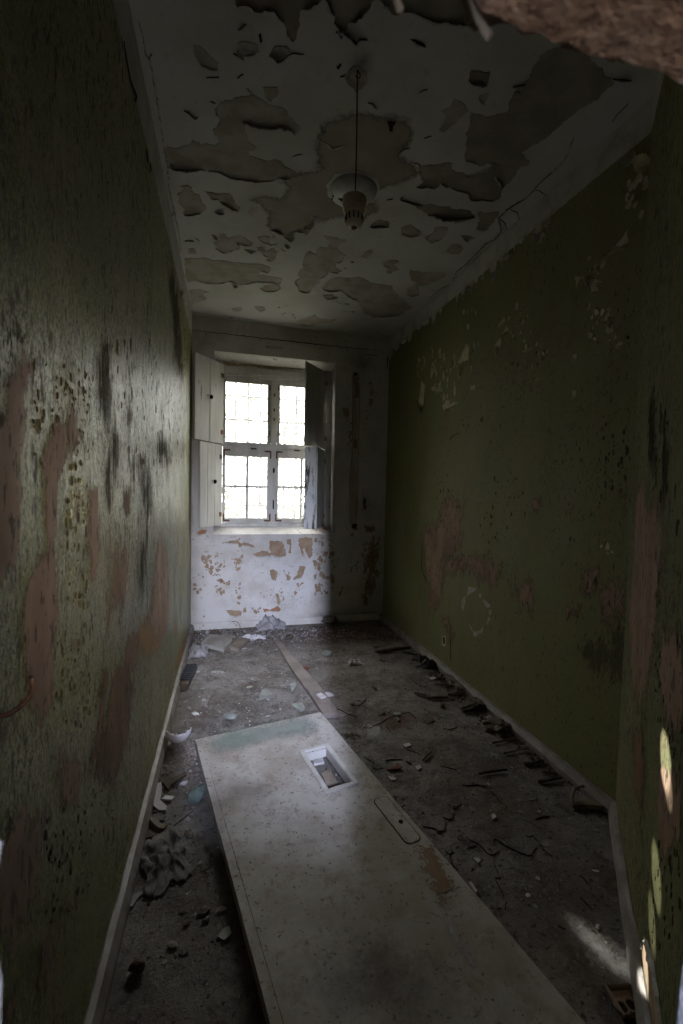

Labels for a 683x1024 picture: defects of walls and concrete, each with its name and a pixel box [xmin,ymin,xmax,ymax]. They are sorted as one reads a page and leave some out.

peeling [235,0,541,64]
peeling [165,86,301,216]
peeling [370,42,626,255]
peeling [181,224,446,326]
crack [428,138,574,300]
peeling [121,338,189,466]
peeling [32,361,98,728]
peeling [193,536,343,618]
peeling [651,632,683,768]